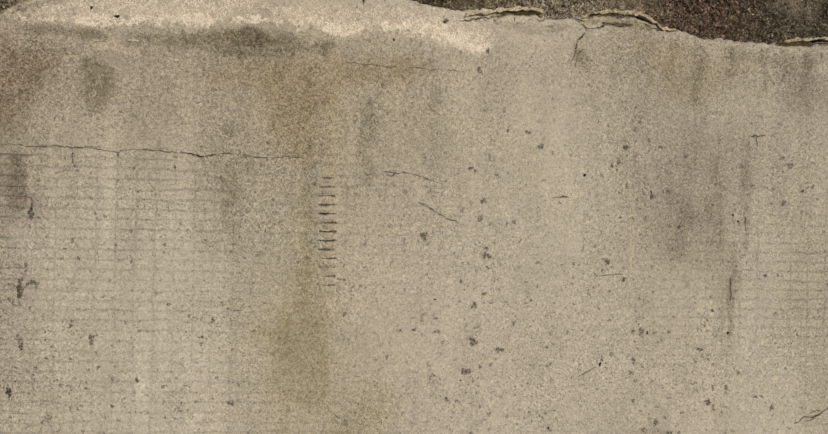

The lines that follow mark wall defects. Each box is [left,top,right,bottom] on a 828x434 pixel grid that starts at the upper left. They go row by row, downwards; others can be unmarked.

peeling [0,0,31,14]
crack [571,21,626,67]
peeling [410,0,828,47]
crack [0,144,302,207]
crack [786,408,828,429]